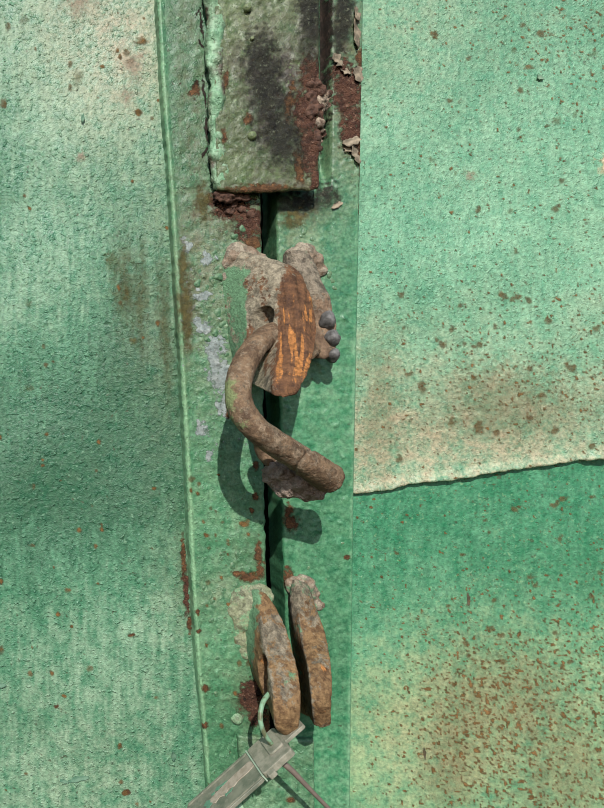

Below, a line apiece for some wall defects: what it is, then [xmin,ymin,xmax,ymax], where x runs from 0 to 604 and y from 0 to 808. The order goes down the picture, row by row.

peeling [353,6,361,49]
peeling [332,53,364,83]
corrosion [197,49,362,249]
peeling [342,136,361,164]
peeling [200,250,218,266]
peeling [181,288,230,448]
corrosion [233,541,265,582]
corrosion [231,676,270,733]